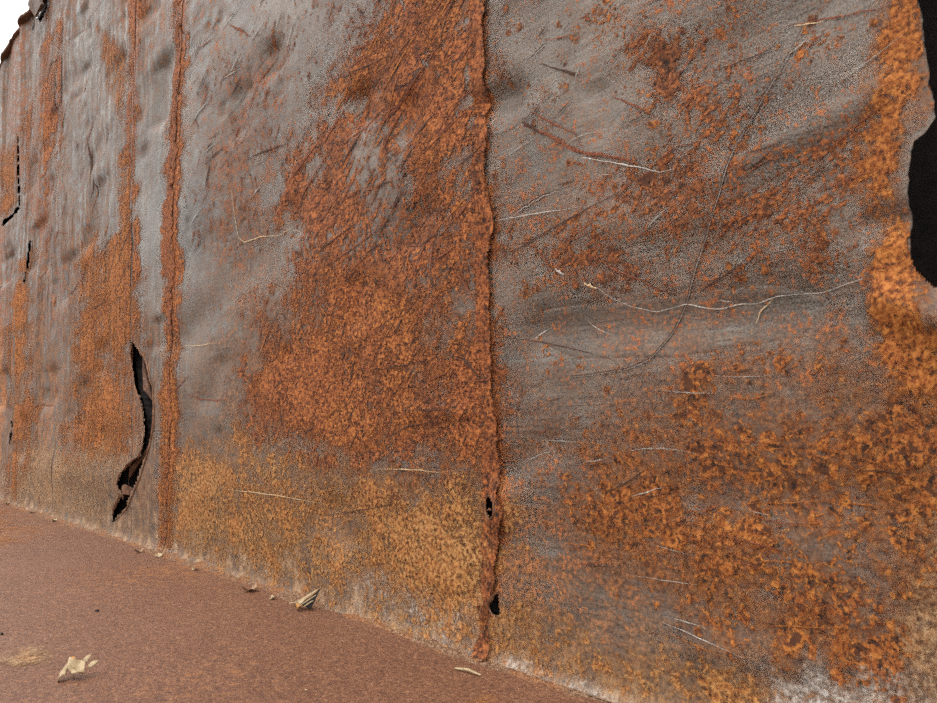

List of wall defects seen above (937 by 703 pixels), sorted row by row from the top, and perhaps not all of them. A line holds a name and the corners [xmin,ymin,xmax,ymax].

corrosion [503,2,561,43]
corrosion [783,10,844,64]
corrosion [205,13,310,156]
crack [7,133,17,222]
corrosion [0,0,152,532]
corrosion [751,331,852,399]
water stain [772,666,927,703]